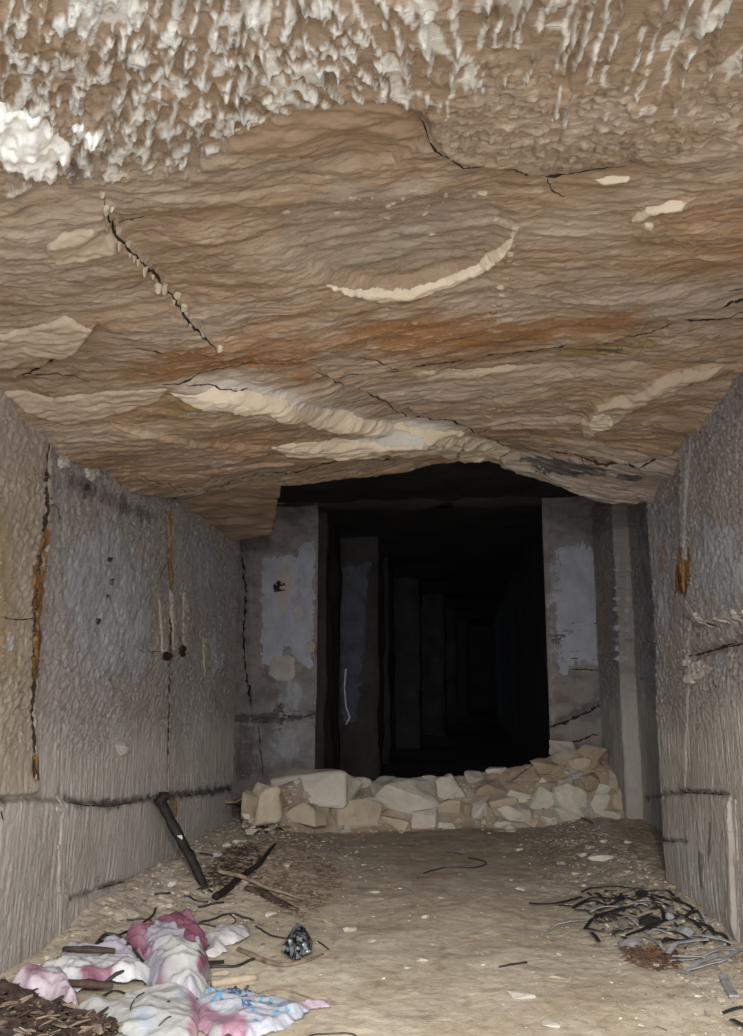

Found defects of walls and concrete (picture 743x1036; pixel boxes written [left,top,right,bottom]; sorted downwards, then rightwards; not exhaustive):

crack [419,118,624,197]
crack [100,192,564,458]
crack [608,288,743,344]
crack [555,450,675,472]
rust [31,528,51,679]
rust [661,537,691,602]